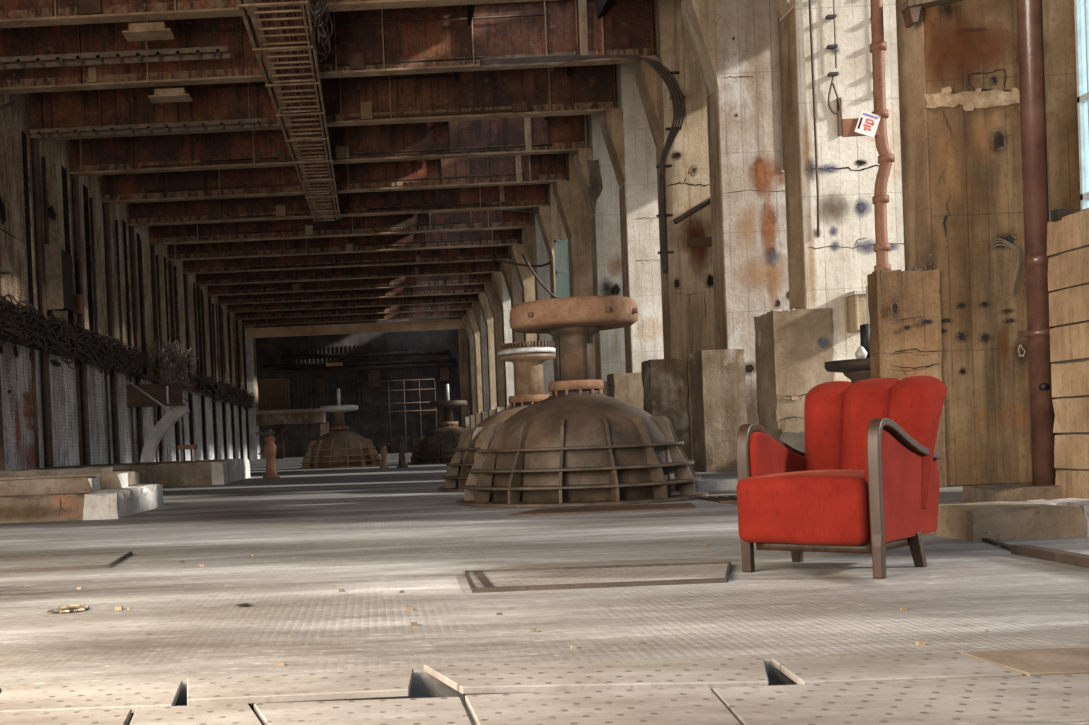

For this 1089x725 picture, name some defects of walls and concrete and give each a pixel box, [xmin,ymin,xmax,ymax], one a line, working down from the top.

rust [745,159,785,249]